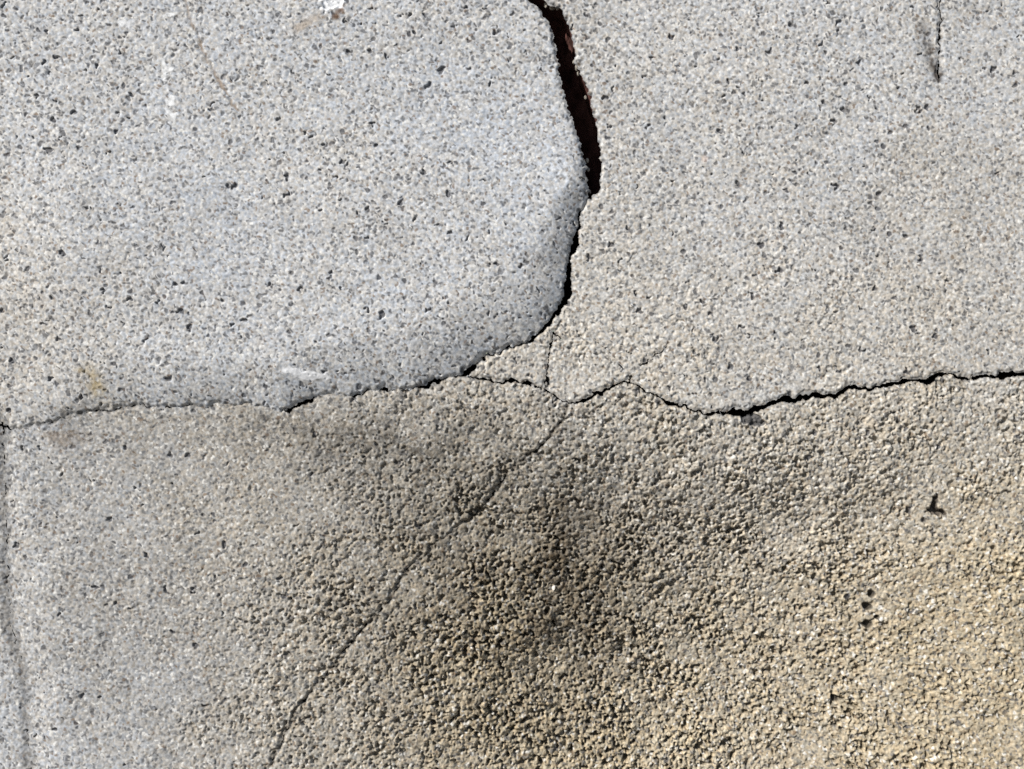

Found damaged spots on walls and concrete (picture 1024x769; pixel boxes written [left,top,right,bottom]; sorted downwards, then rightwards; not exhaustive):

crack [303,0,1024,702]
crack [282,397,315,413]
crack [0,422,11,495]